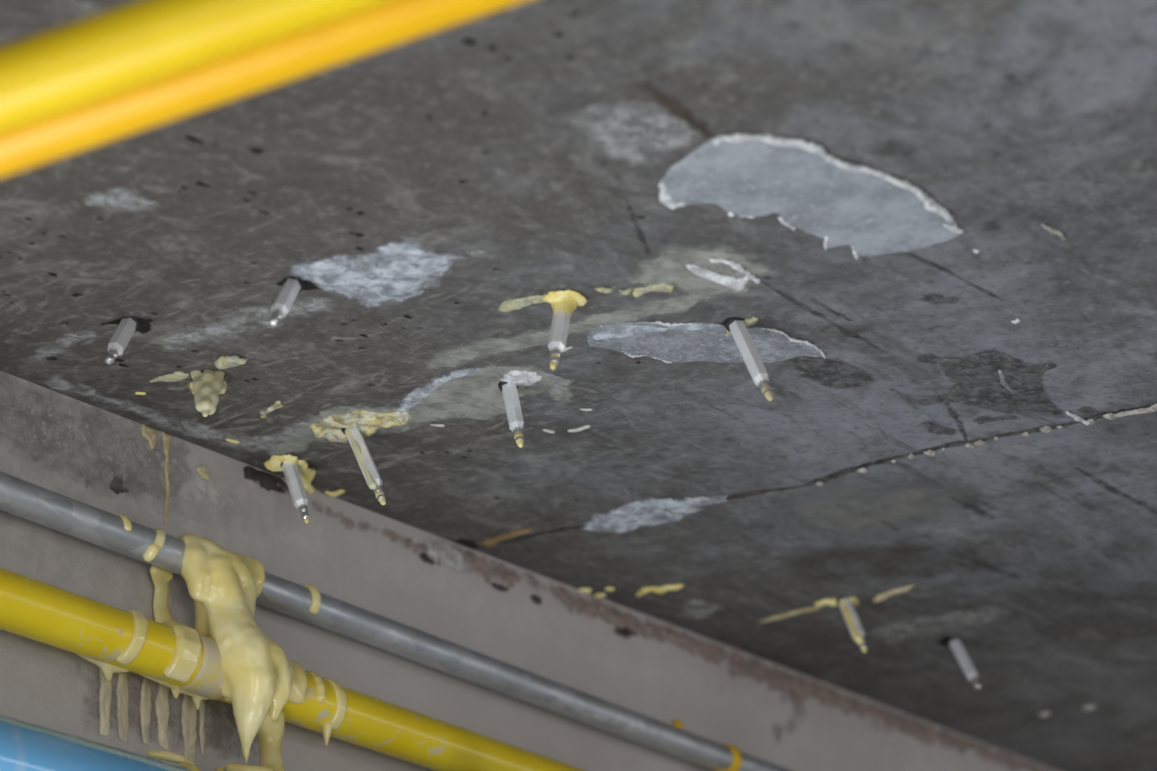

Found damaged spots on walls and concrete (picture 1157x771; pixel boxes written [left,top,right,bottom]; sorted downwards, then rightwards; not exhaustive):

peeling [658,133,963,260]
peeling [628,248,768,299]
peeling [587,321,745,364]
peeling [746,327,874,389]
crack [655,403,1157,516]
corrosion [480,528,532,547]
crack [475,524,603,547]